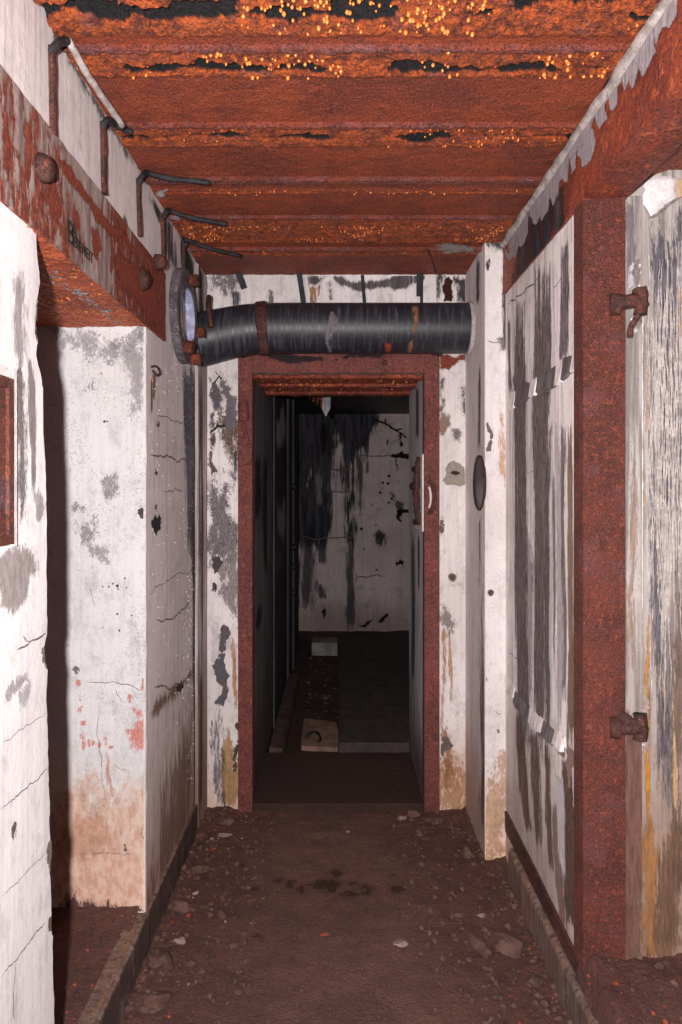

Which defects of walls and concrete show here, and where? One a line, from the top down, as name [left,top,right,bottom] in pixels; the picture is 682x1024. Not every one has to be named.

rust [1,124,11,172]
rust [47,159,161,329]
leakage [501,182,570,392]
crack [18,633,46,650]
crack [152,454,190,492]
crack [156,600,191,623]
peeling [207,371,238,706]
leakage [286,414,380,628]
leakage [498,389,574,925]
leakage [626,203,682,914]
leakage [626,735,642,960]
crack [1,923,45,1020]